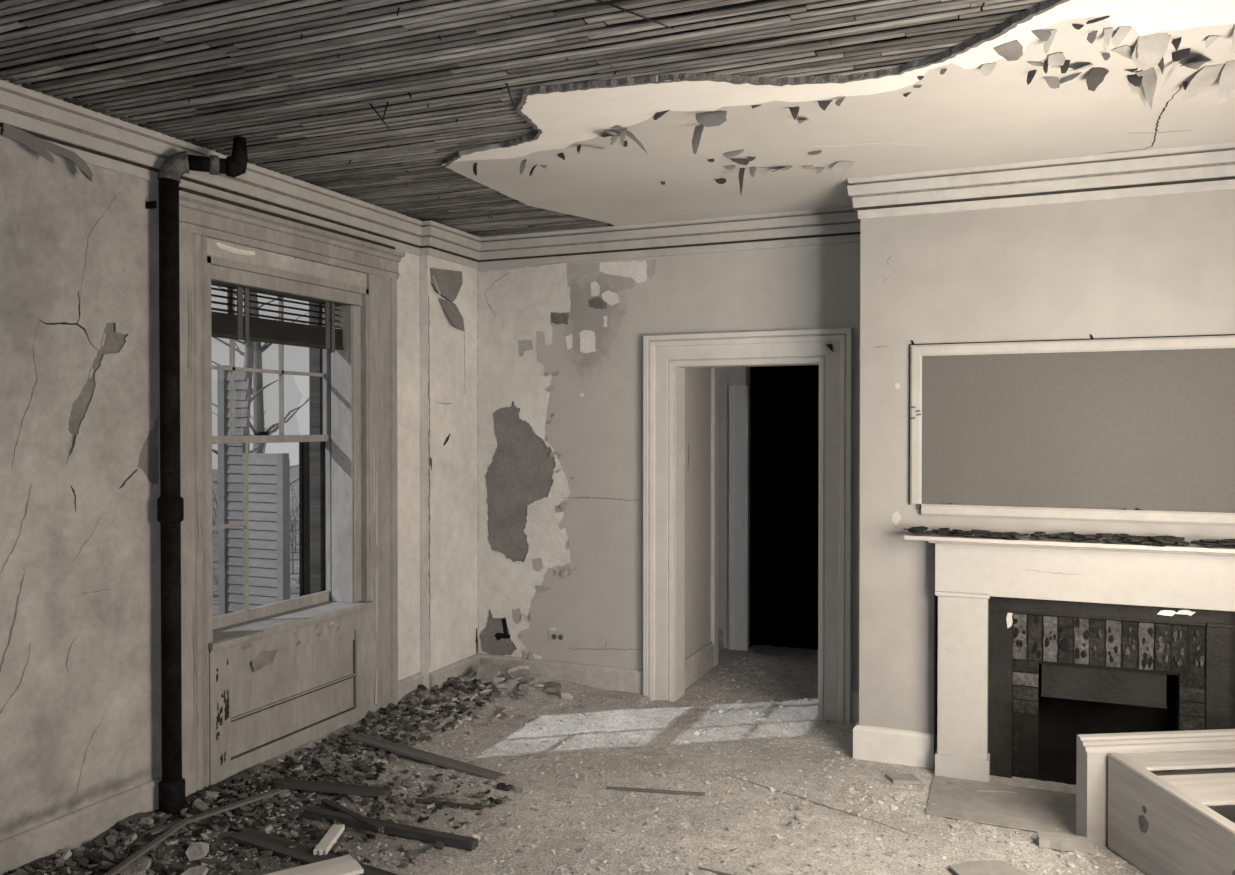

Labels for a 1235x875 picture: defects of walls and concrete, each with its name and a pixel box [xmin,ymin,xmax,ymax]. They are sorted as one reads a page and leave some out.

flaking render [0,0,1235,235]
crack [1110,85,1189,153]
flaking render [66,323,131,465]
peeling [477,259,657,664]